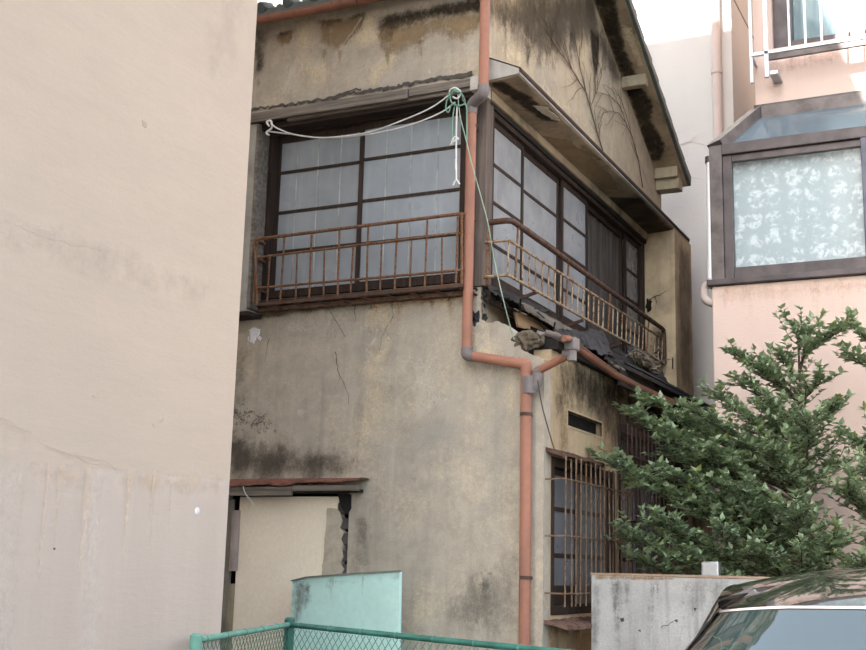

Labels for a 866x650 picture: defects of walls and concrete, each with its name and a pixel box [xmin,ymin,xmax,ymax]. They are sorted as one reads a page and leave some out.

damp [319,13,364,55]
damp [380,14,479,56]
peeling [248,327,262,344]
crack [329,306,356,404]
damp [231,440,337,477]